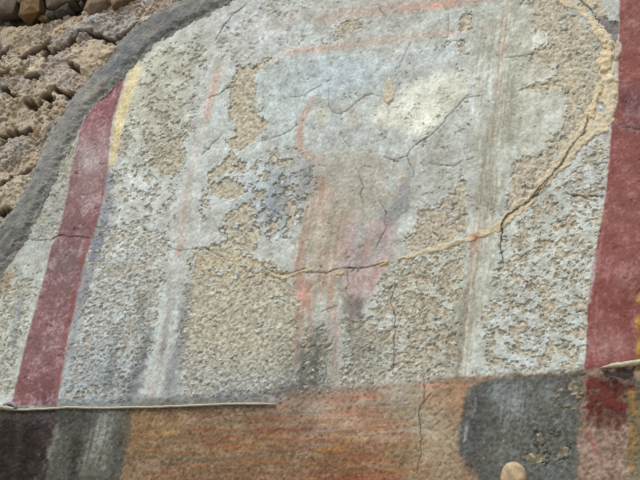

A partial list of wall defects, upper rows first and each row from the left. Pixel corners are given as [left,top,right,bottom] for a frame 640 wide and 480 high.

crack [262,262,384,295]
peeling [176,56,473,400]
crack [500,118,588,261]
peeling [482,140,610,414]
peeling [505,0,601,211]